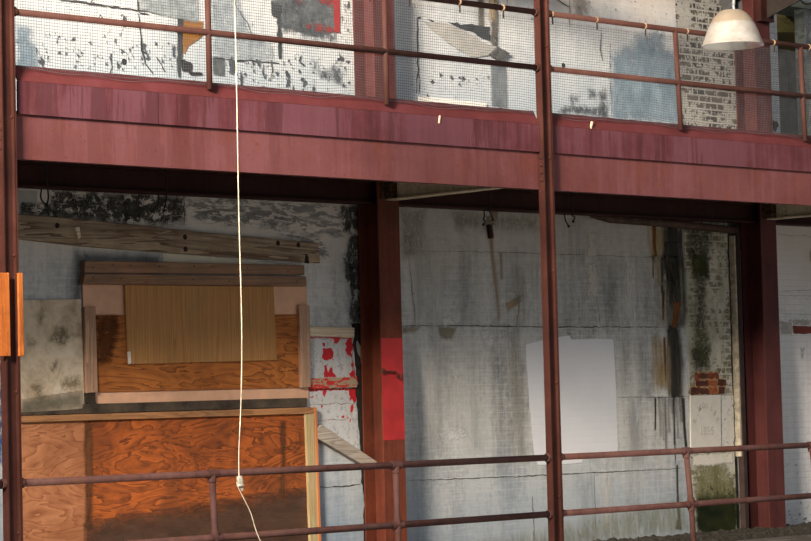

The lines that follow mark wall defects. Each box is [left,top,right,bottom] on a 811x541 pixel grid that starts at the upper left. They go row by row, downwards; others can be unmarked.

peeling [19,190,363,452]
damp [650,227,687,530]
spalling [690,371,733,429]
peeling [692,441,734,466]